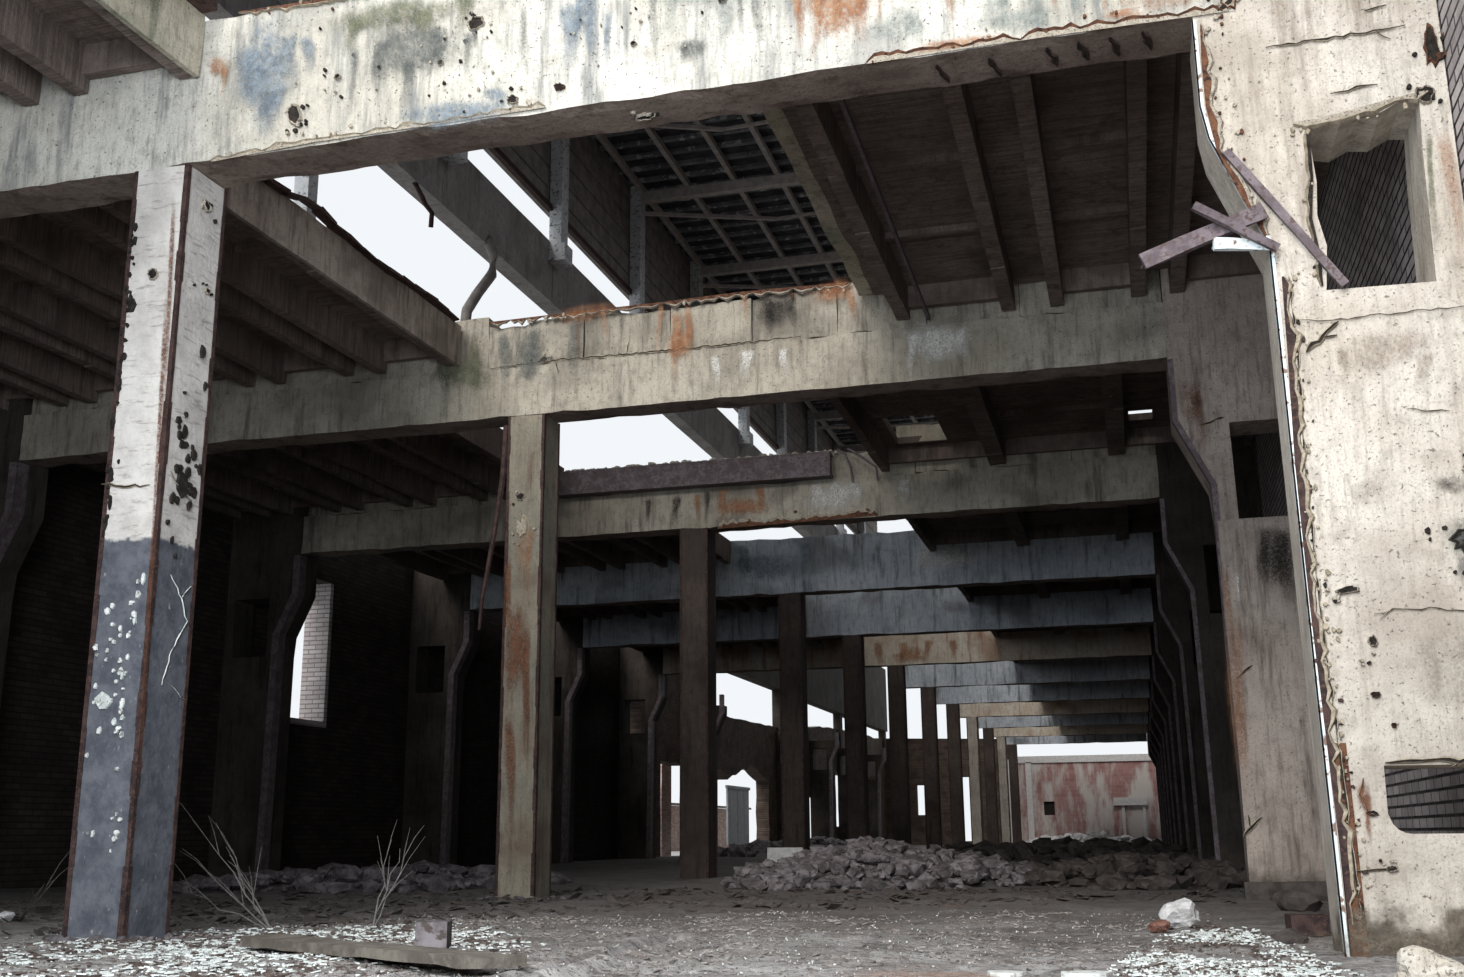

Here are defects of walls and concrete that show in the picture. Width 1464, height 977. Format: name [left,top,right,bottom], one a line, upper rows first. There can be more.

water stain [237,27,313,118]
water stain [347,11,445,87]
water stain [407,88,505,126]
water stain [458,0,477,60]
rust [793,0,880,30]
rust [658,308,692,356]
peeling [165,412,202,558]
spalling [1424,525,1464,575]
peeling [92,572,145,739]
rust [505,565,529,796]
peeling [91,812,123,853]
rust [1334,743,1371,957]